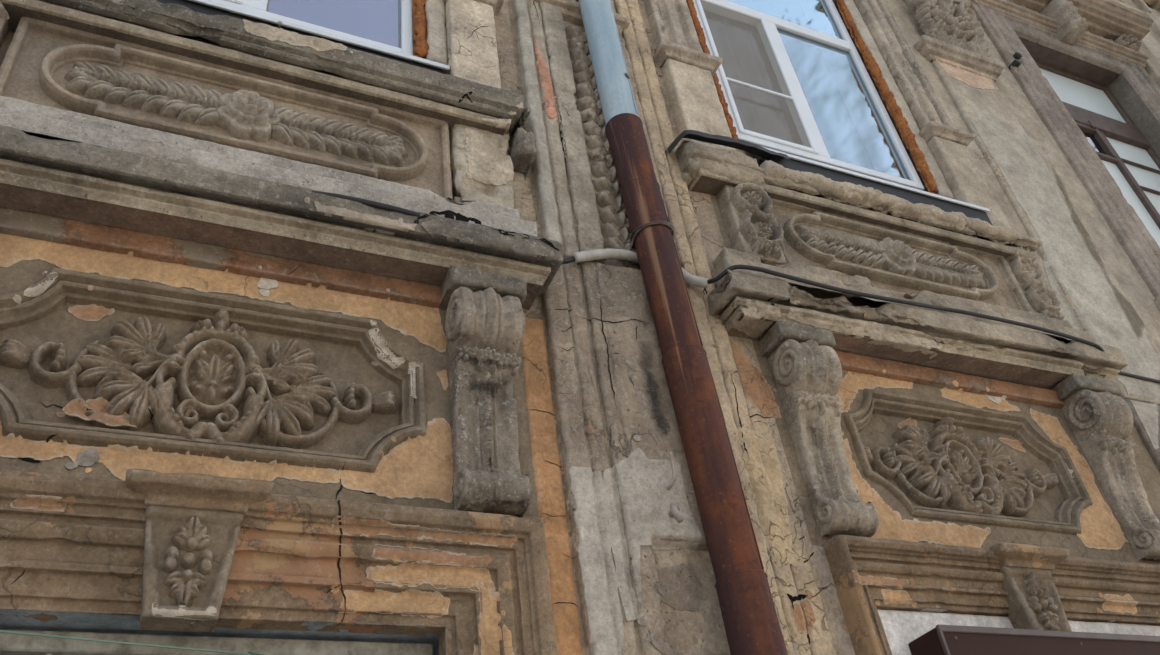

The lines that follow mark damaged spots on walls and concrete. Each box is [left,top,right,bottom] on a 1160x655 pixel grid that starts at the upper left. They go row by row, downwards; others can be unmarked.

spalling [242,19,353,54]
flaking render [533,37,561,125]
peeling [0,233,449,399]
crack [555,300,645,408]
crack [732,371,772,460]
peeling [842,431,991,548]
peeling [940,380,1129,550]
crack [326,464,374,625]
spalling [653,552,703,612]
crack [787,586,827,654]